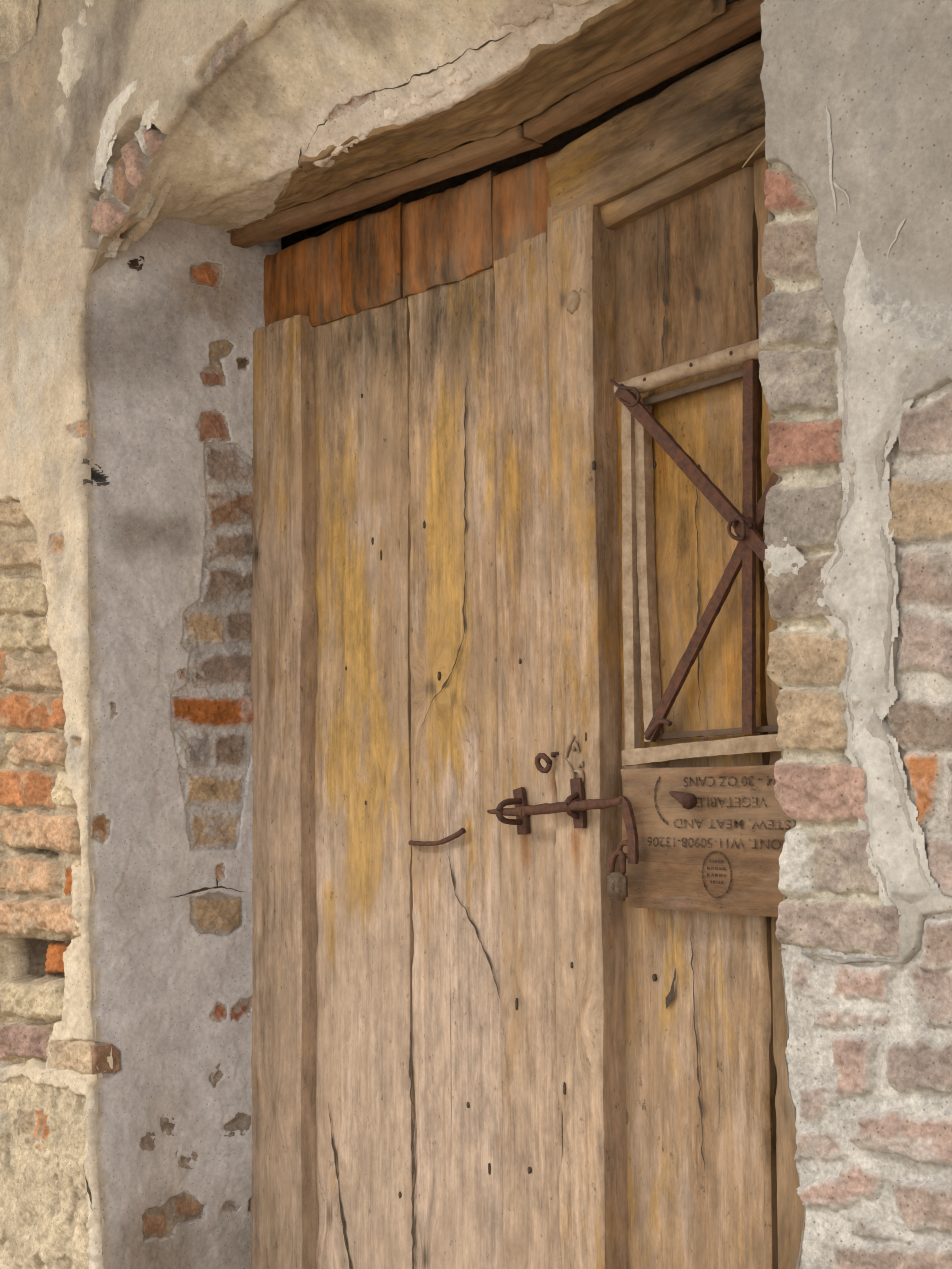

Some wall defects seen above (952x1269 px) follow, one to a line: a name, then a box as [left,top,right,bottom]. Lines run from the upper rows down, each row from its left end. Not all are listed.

crack [298,29,521,173]
spalling [91,79,167,258]
spalling [66,401,93,443]
peeling [163,409,254,936]
spalling [758,162,952,1269]
spalling [0,499,122,1269]
spalling [137,1115,177,1151]
spalling [224,1112,251,1137]
spalling [175,1151,198,1169]
spalling [142,1192,204,1238]
spalling [220,1199,252,1215]